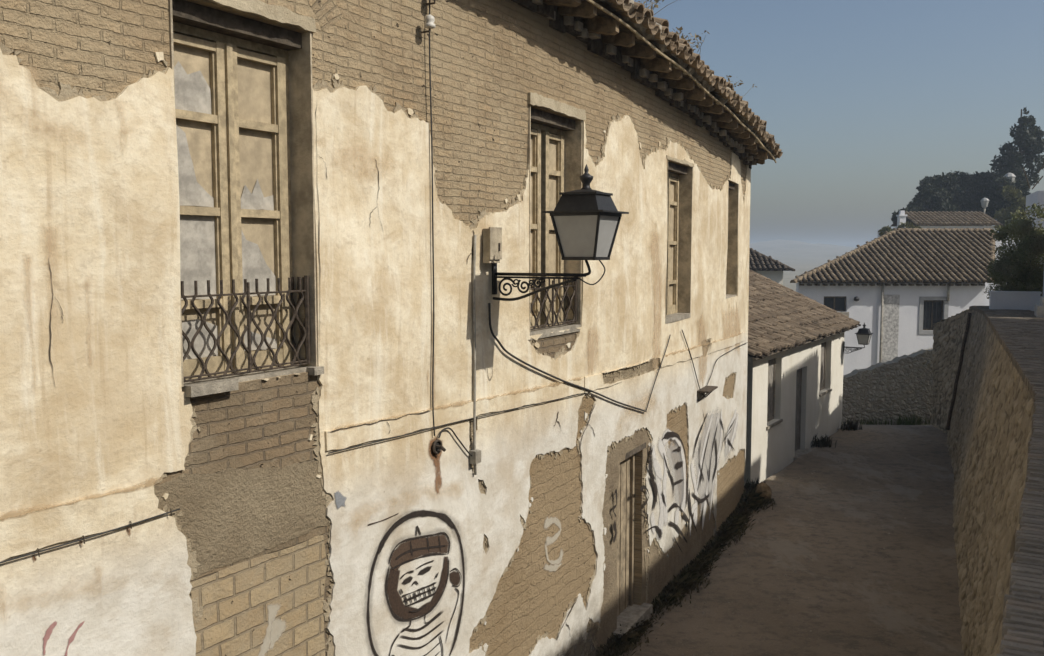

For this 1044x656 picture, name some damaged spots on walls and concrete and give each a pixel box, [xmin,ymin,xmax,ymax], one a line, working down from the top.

flaking render [0,0,171,102]
flaking render [243,0,746,229]
crack [48,258,63,384]
flaking render [528,331,579,360]
flaking render [154,372,334,656]
corrosion [429,438,442,493]
flaking render [469,393,745,656]